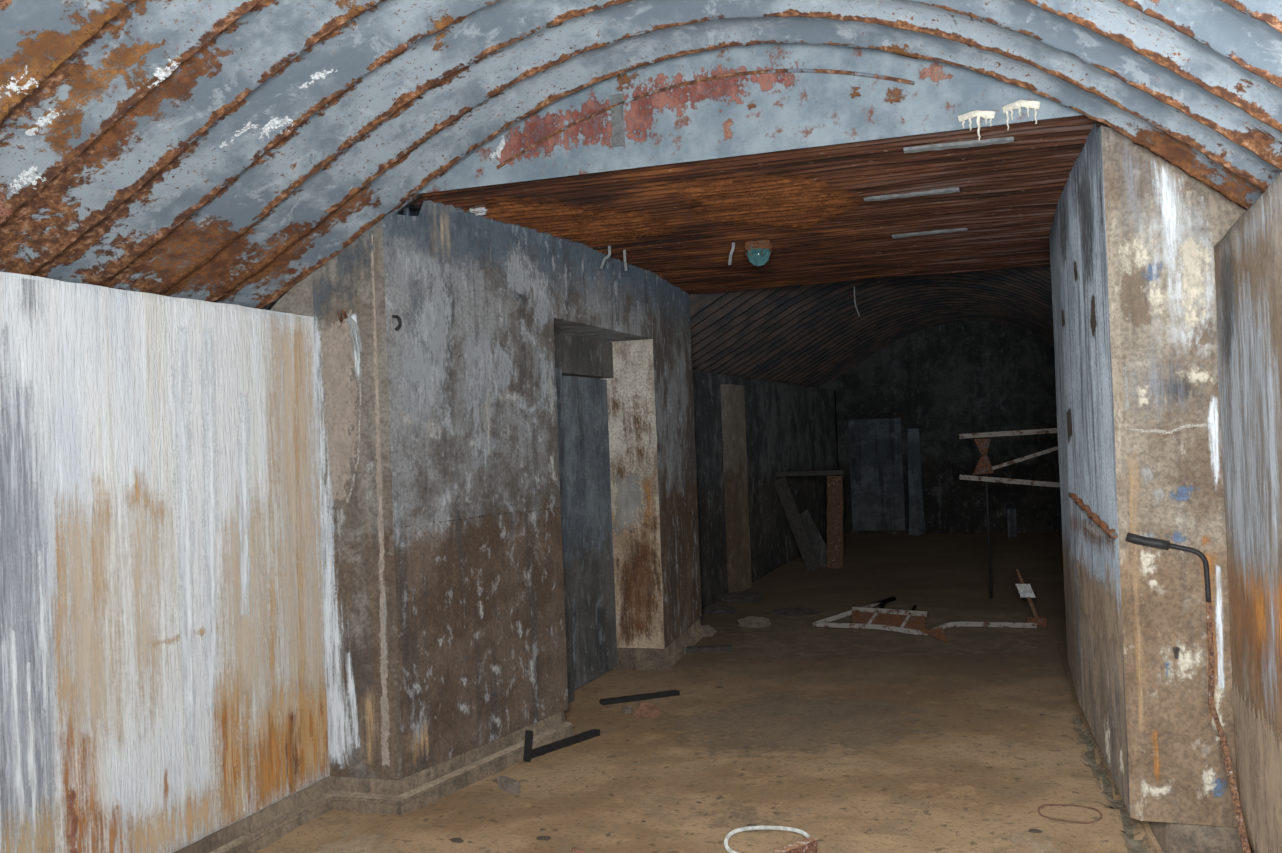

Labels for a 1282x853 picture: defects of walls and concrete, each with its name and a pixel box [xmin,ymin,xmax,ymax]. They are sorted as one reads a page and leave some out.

corrosion [0,0,242,184]
corrosion [335,0,382,18]
corrosion [428,9,454,51]
corrosion [723,119,733,141]
corrosion [884,87,905,104]
corrosion [868,44,953,84]
corrosion [126,183,381,298]
corrosion [612,387,650,460]
leakage [0,392,44,826]
corrosion [4,325,329,853]
corrosion [617,481,660,644]
corrosion [1232,567,1282,698]